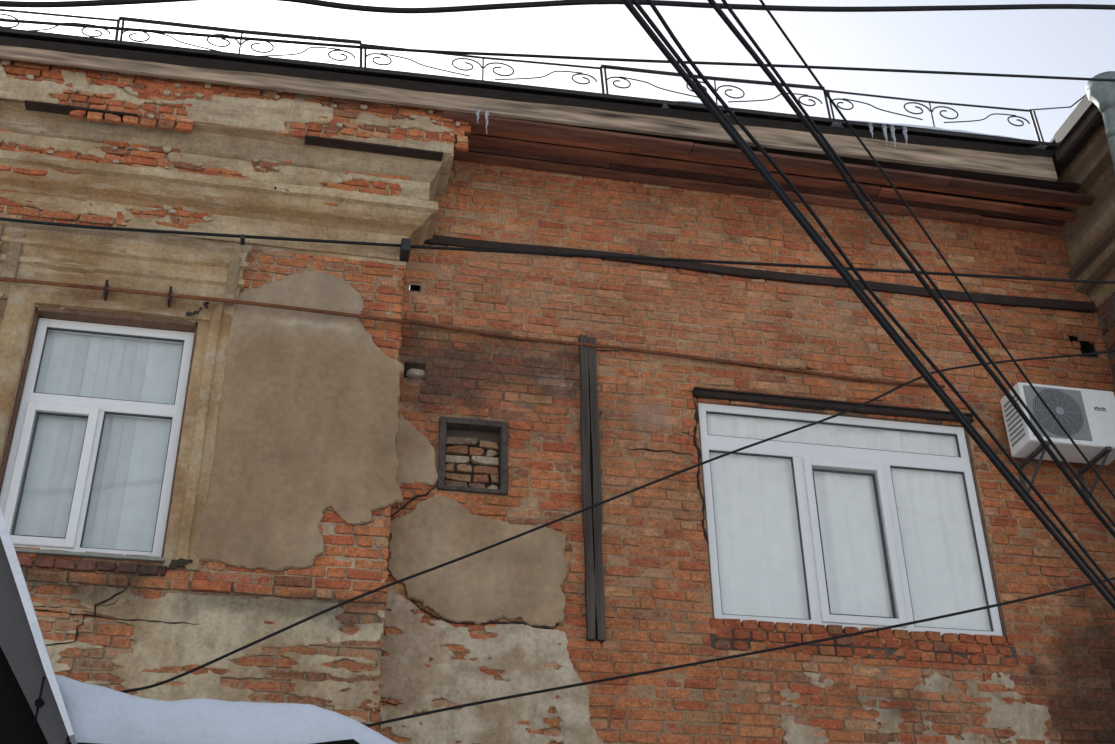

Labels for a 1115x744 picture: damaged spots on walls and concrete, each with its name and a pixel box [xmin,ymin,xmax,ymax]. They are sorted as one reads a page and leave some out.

flaking render [0,59,471,152]
flaking render [0,189,224,229]
flaking render [0,129,292,180]
flaking render [319,172,411,196]
flaking render [26,270,604,744]
crack [34,582,196,646]
flaking render [778,682,830,744]
flaking render [803,672,834,689]
flaking render [848,672,1051,744]